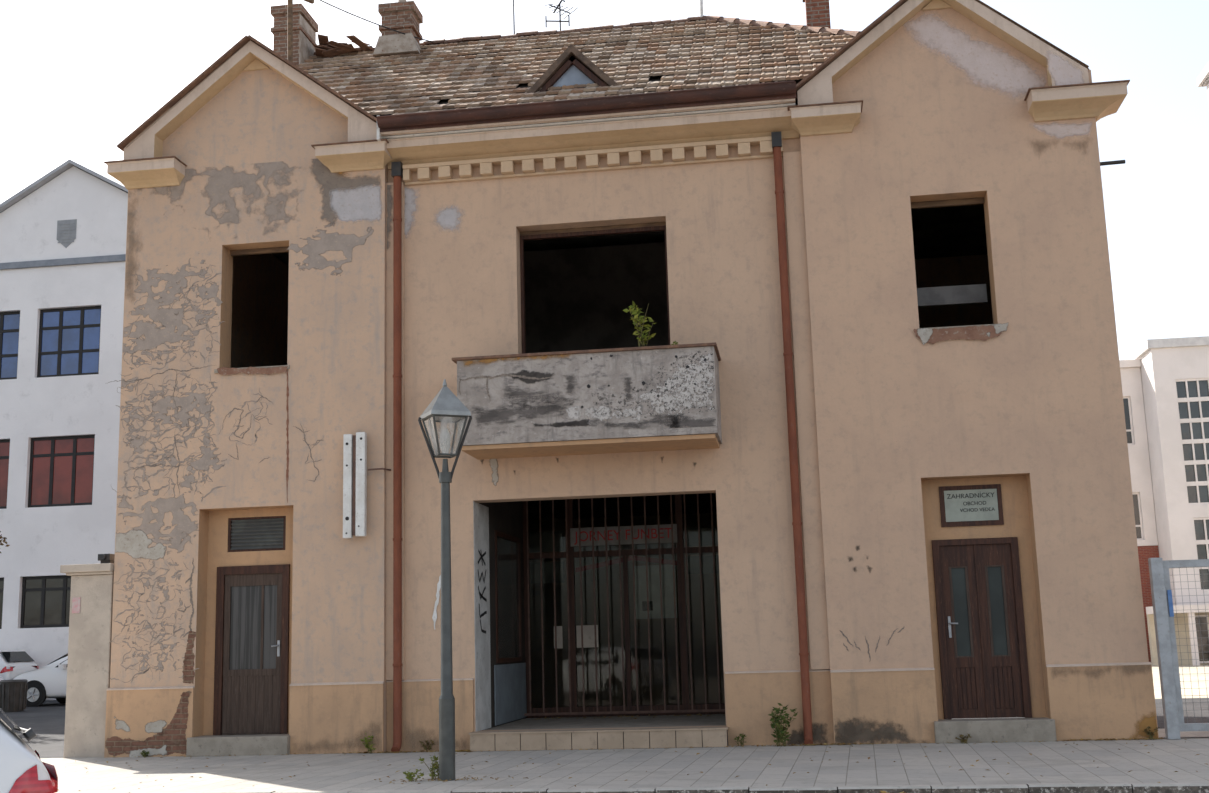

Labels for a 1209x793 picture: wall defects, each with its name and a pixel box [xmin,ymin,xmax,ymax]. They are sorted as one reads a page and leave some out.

peeling [138,161,297,234]
peeling [288,223,374,276]
crack [108,265,324,498]
peeling [510,351,715,421]
peeling [105,259,288,756]